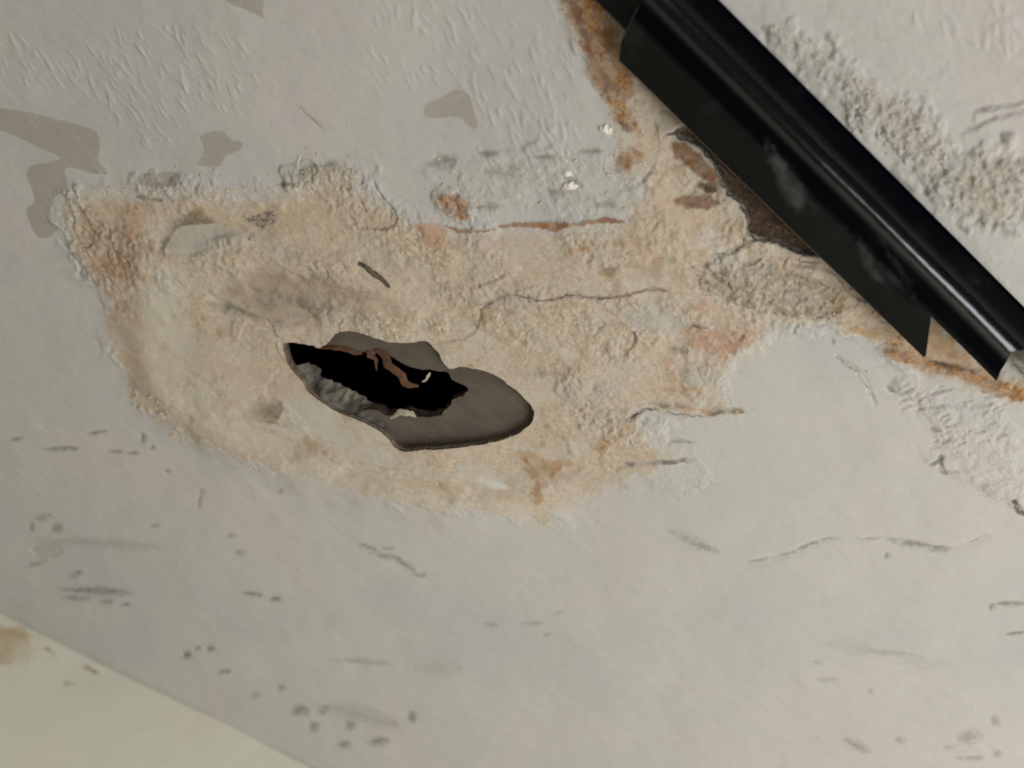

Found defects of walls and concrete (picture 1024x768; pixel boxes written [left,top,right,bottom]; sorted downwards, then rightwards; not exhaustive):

corrosion [560,0,646,172]
peeling [138,172,181,188]
corrosion [437,194,625,234]
spalling [551,170,579,194]
corrosion [670,141,721,211]
spalling [668,126,819,314]
spalling [837,75,1023,225]
water stain [75,77,1024,525]
crack [498,287,672,302]